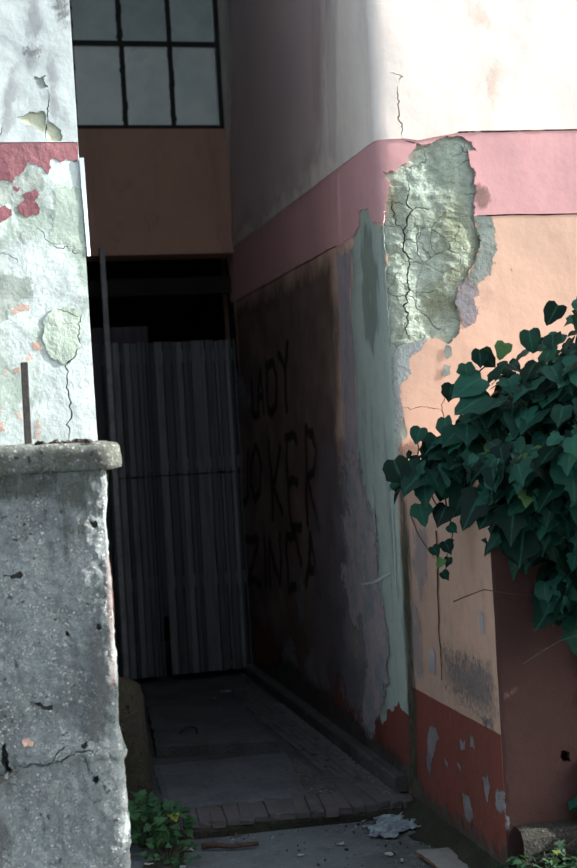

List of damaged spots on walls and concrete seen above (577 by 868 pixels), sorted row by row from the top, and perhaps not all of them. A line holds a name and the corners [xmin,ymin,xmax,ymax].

peeling [17,111,63,142]
peeling [0,271,35,323]
peeling [32,306,84,364]
crack [63,311,82,439]
crack [391,189,437,329]
peeling [338,136,497,740]